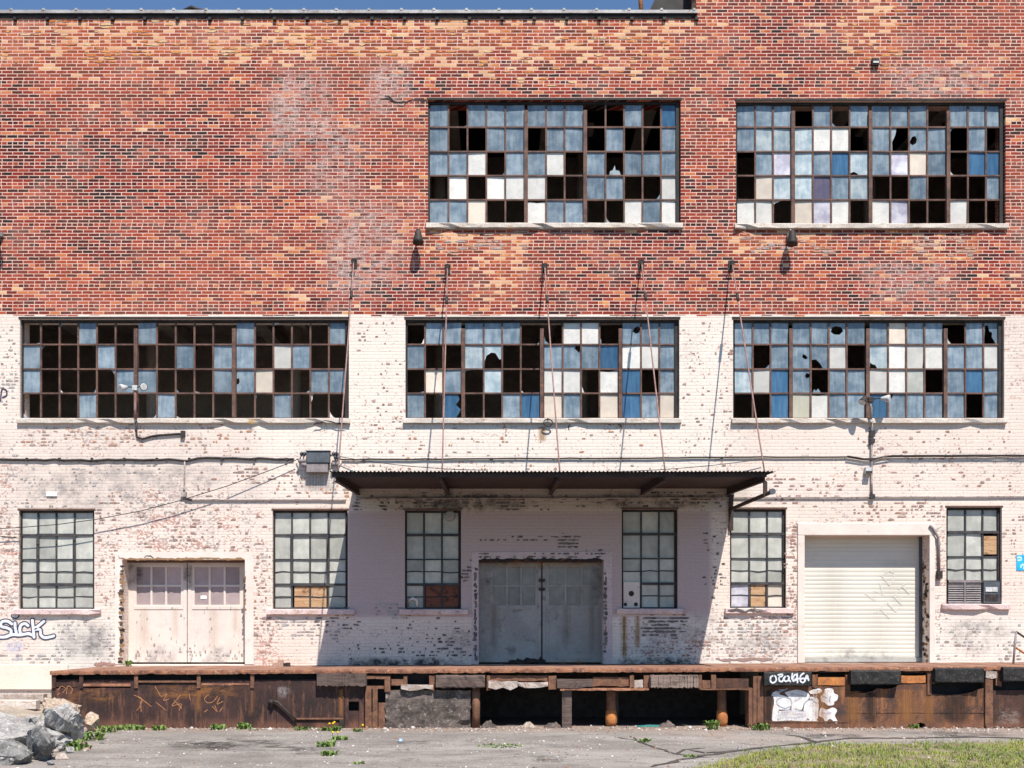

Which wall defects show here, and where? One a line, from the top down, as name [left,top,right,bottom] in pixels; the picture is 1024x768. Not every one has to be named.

peeling [10,424,143,457]
peeling [766,471,858,507]
peeling [854,499,945,521]
peeling [885,427,1009,487]
peeling [0,461,361,663]
spalling [374,533,605,662]
peeling [640,523,797,663]
peeling [922,562,1022,663]